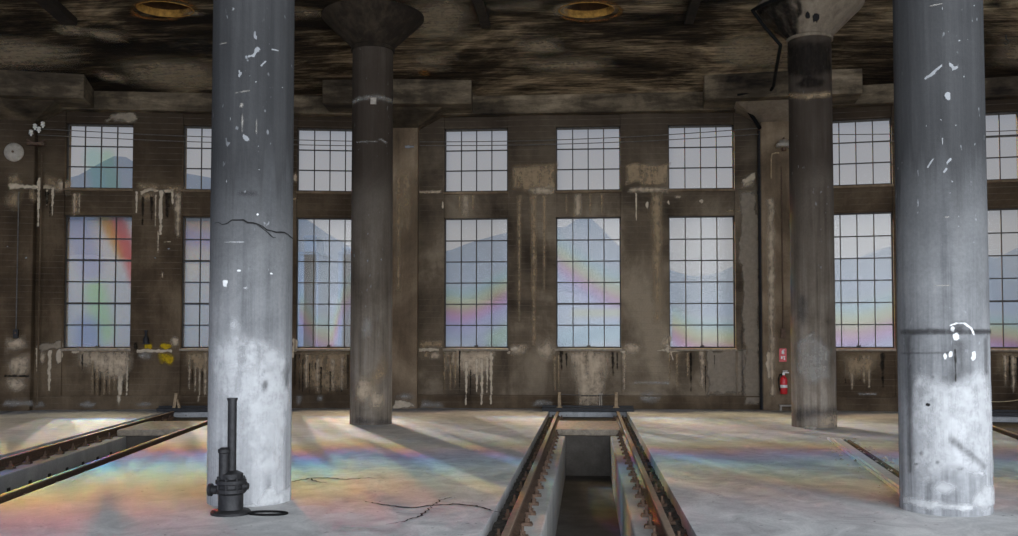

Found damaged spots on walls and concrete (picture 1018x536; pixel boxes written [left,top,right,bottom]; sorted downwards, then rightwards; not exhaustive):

leakage [8,176,80,226]
leakage [135,184,181,251]
crack [216,219,293,239]
leakage [81,352,130,403]
leakage [188,340,349,472]
crack [292,477,497,524]